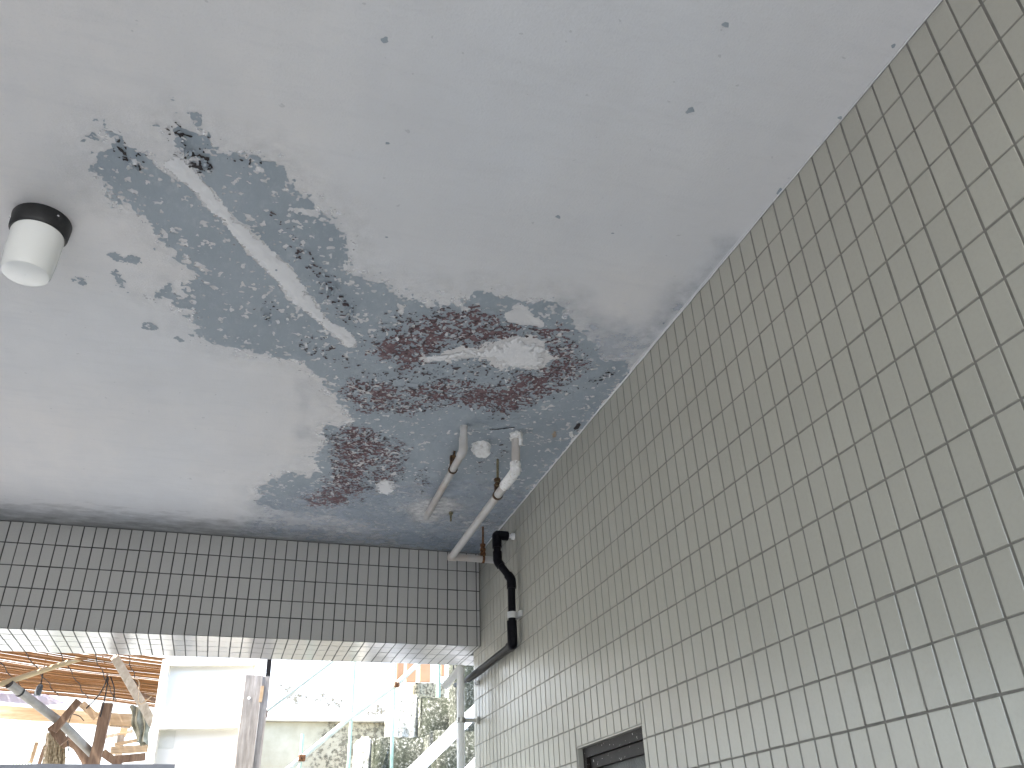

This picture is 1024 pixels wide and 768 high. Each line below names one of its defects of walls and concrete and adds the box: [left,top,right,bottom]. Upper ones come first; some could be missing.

peeling [80,97,638,553]